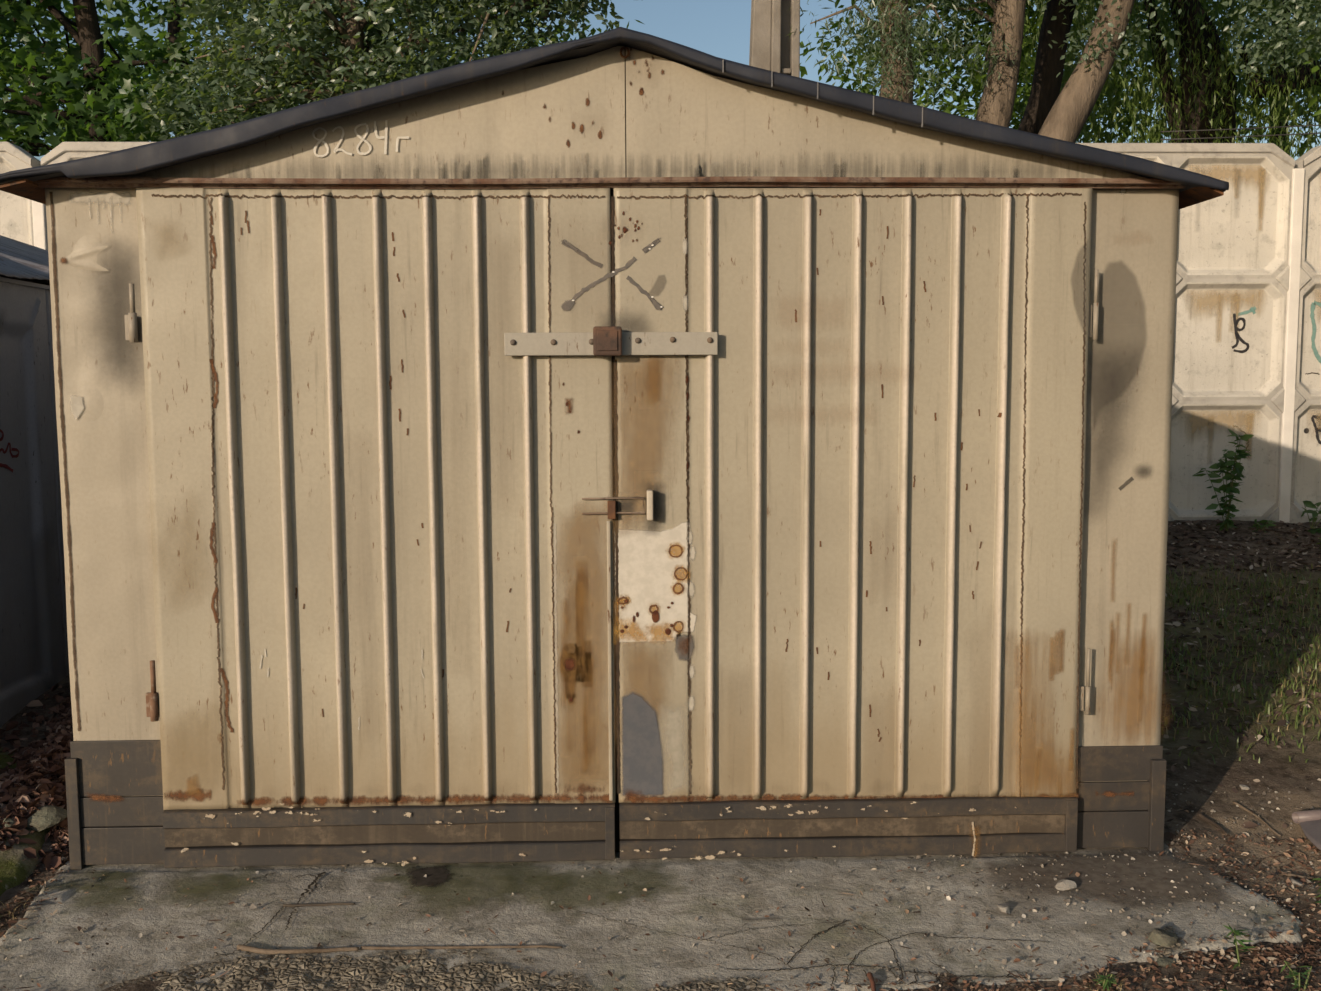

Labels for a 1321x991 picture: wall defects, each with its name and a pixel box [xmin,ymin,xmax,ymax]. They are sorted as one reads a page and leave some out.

rust [609,197,643,326]
peeling [151,192,1082,794]
rust [240,359,905,806]
rust [165,780,211,801]
crack [580,911,1051,990]